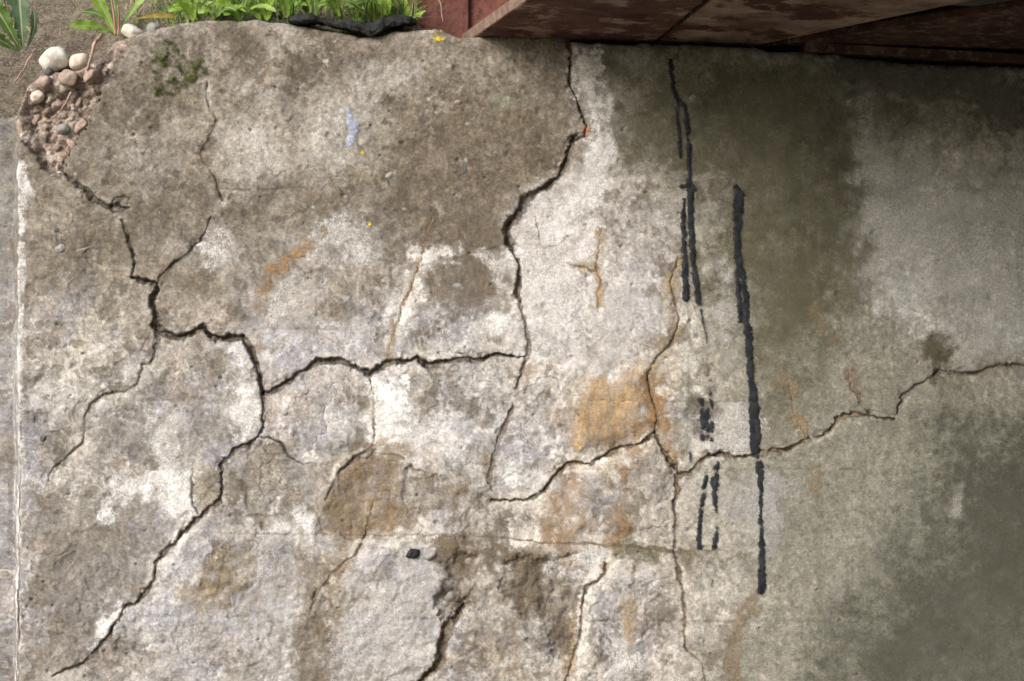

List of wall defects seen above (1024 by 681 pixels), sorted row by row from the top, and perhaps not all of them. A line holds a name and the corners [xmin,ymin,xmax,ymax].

spalling [13,37,132,175]
efflorescence [198,233,228,268]
corrosion [256,228,327,307]
efflorescence [296,213,372,268]
crack [574,234,602,307]
leakage [386,41,1024,401]
crack [58,38,586,681]
corrosion [569,259,682,464]
leakage [687,398,766,461]
crack [486,264,1024,658]
leakage [816,407,1024,681]
crack [565,563,606,681]